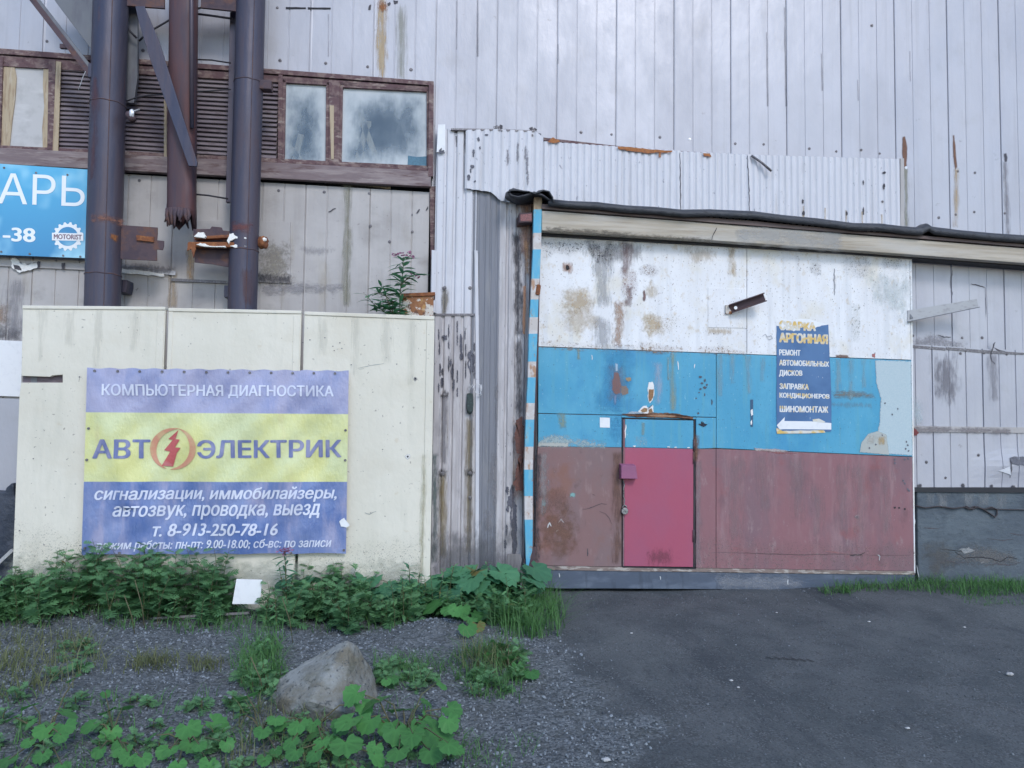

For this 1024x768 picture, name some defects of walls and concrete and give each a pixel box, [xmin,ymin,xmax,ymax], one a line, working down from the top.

corrosion [368,0,398,77]
corrosion [618,146,672,157]
damp [343,187,351,305]
peeling [629,382,654,414]
peeling [860,431,909,464]